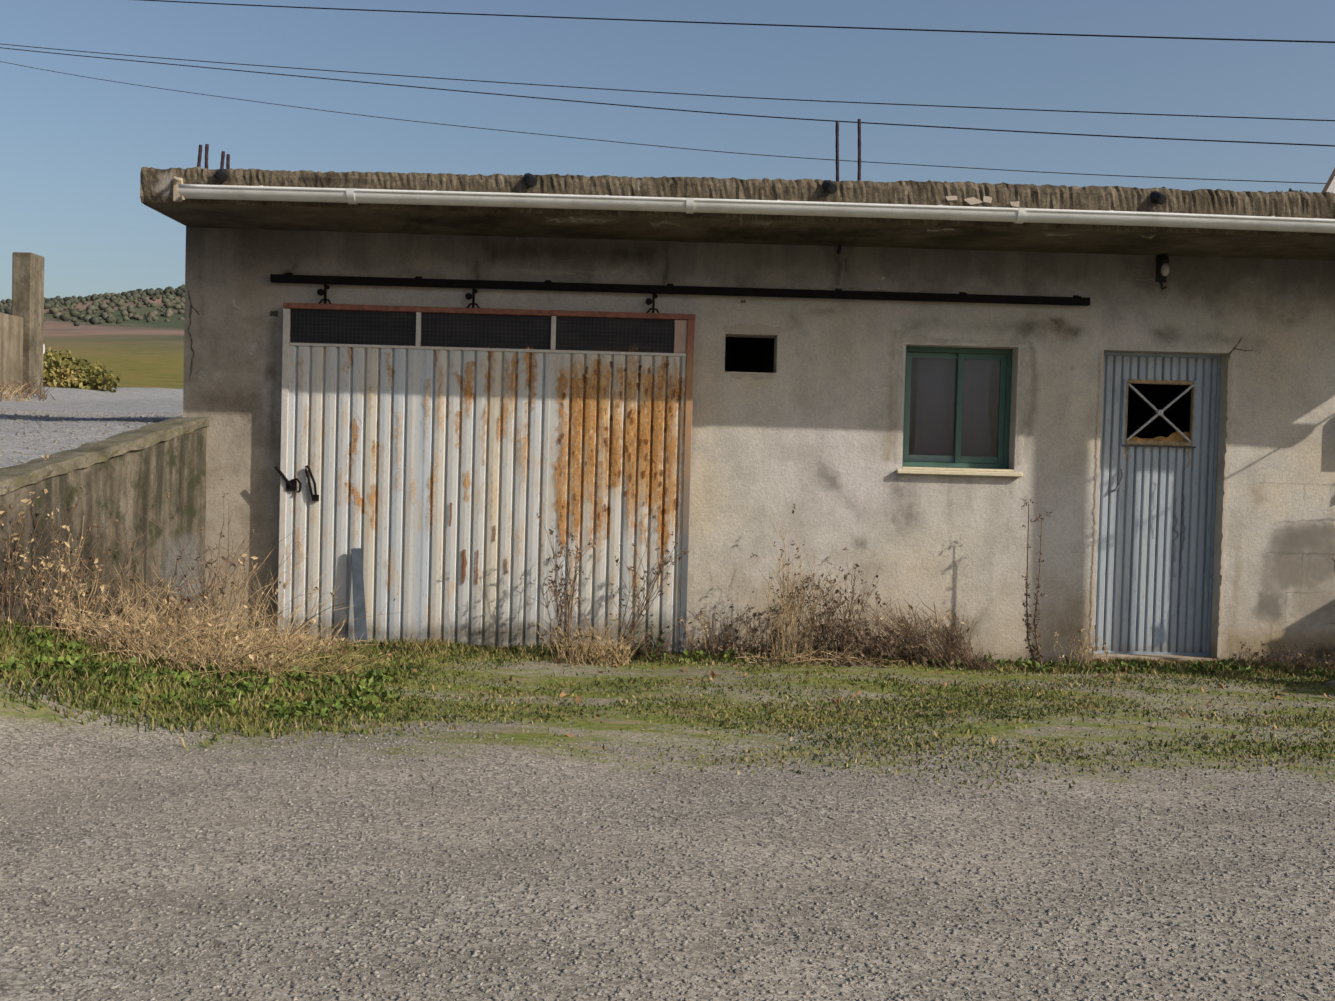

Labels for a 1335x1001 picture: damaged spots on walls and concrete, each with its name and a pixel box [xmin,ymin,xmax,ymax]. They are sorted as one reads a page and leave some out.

corrosion [456,351,492,432]
corrosion [487,347,536,438]
corrosion [555,358,683,559]
corrosion [461,549,479,584]